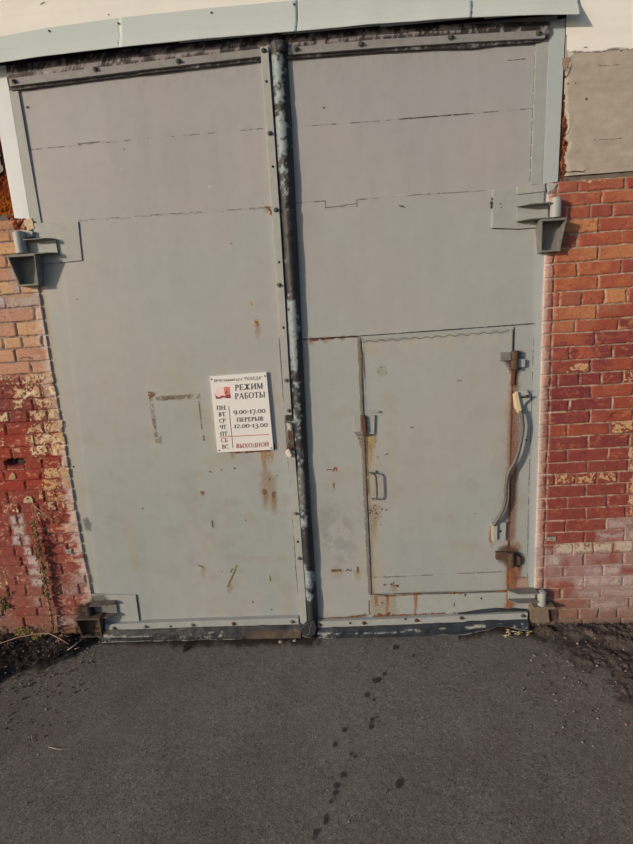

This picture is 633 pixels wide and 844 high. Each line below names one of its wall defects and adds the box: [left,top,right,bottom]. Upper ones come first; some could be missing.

spalling [558,47,633,183]
spalling [0,139,27,230]
peeling [0,371,66,465]
peeling [609,420,633,435]
peeling [37,466,75,523]
corrosion [496,352,528,609]
peeling [554,471,616,485]
corrosion [320,582,466,619]